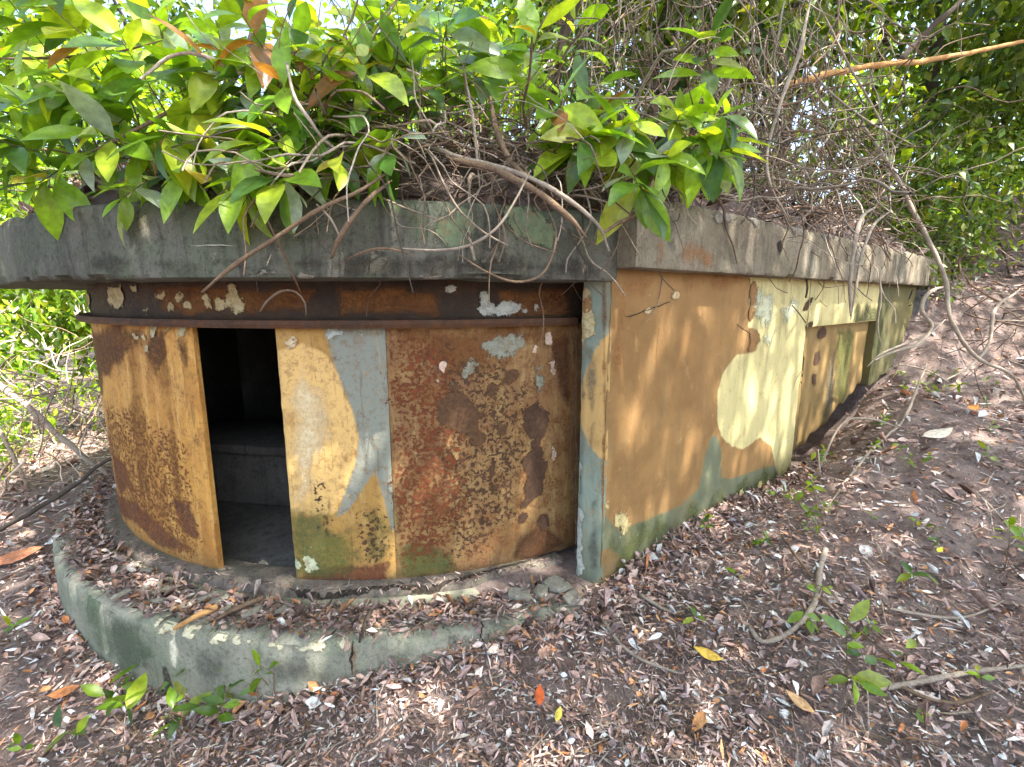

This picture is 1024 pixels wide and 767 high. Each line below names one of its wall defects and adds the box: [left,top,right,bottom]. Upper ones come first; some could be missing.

peeling [107,284,137,309]
peeling [155,283,246,315]
corrosion [156,286,314,315]
corrosion [341,288,437,315]
peeling [477,291,539,318]
corrosion [499,290,567,316]
corrosion [91,325,165,398]
corrosion [398,327,569,401]
spalling [436,332,553,448]
corrosion [113,457,198,550]
corrosion [515,526,560,560]
crack [348,642,356,674]